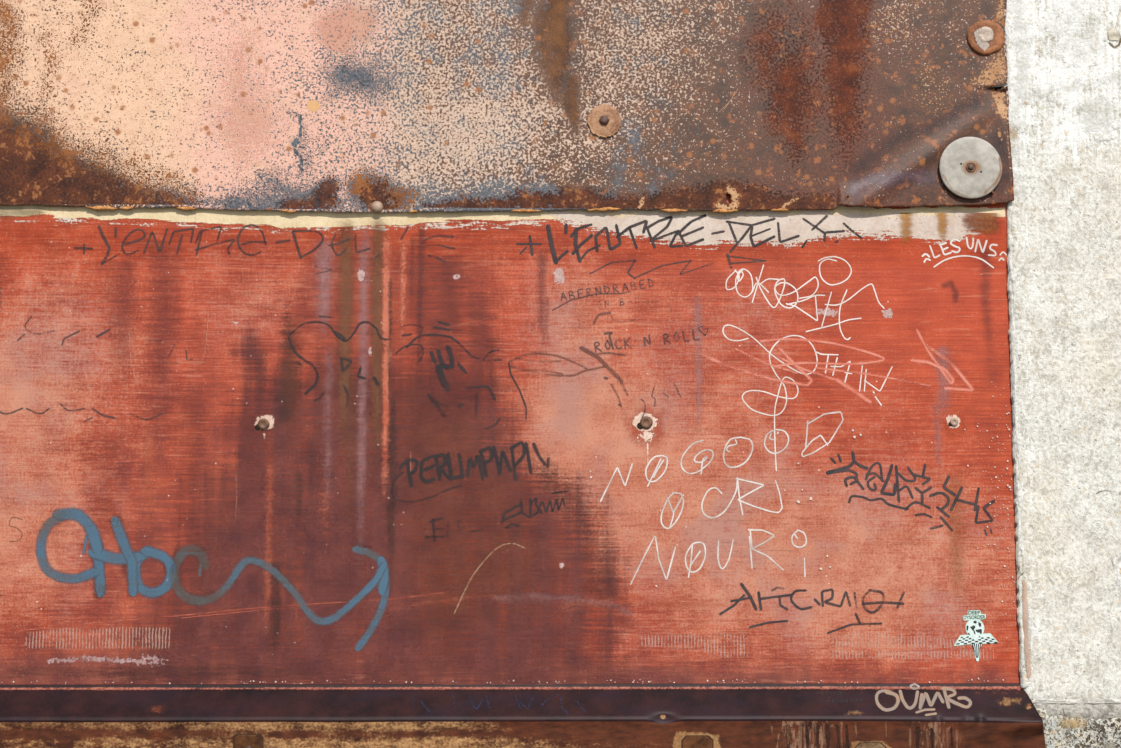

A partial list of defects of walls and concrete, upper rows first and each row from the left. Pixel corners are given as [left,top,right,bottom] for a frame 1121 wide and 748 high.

rust [0,0,206,205]
peeling [319,45,399,105]
rust [518,0,581,137]
rust [738,0,928,189]
peeling [0,108,1005,250]
rust [275,165,835,210]
rust [988,130,1017,190]
rust [805,712,859,748]
rust [909,727,957,748]